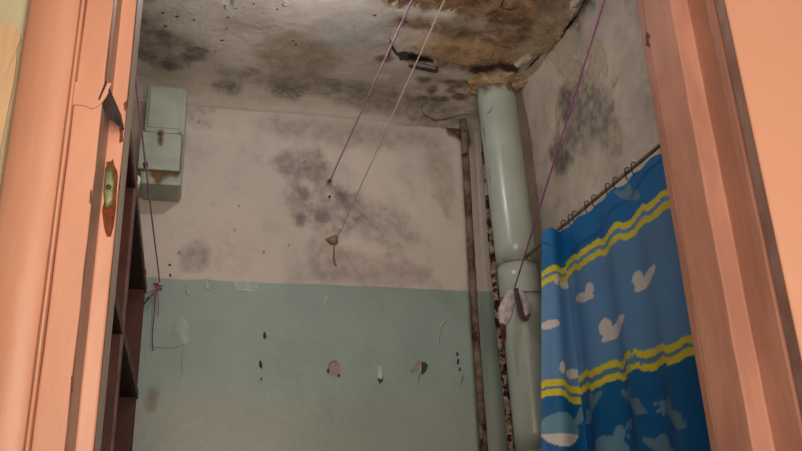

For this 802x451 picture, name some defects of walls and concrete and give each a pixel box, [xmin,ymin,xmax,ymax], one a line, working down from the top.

spalling [379,38,439,73]
spalling [464,60,529,100]
peeling [411,361,428,383]